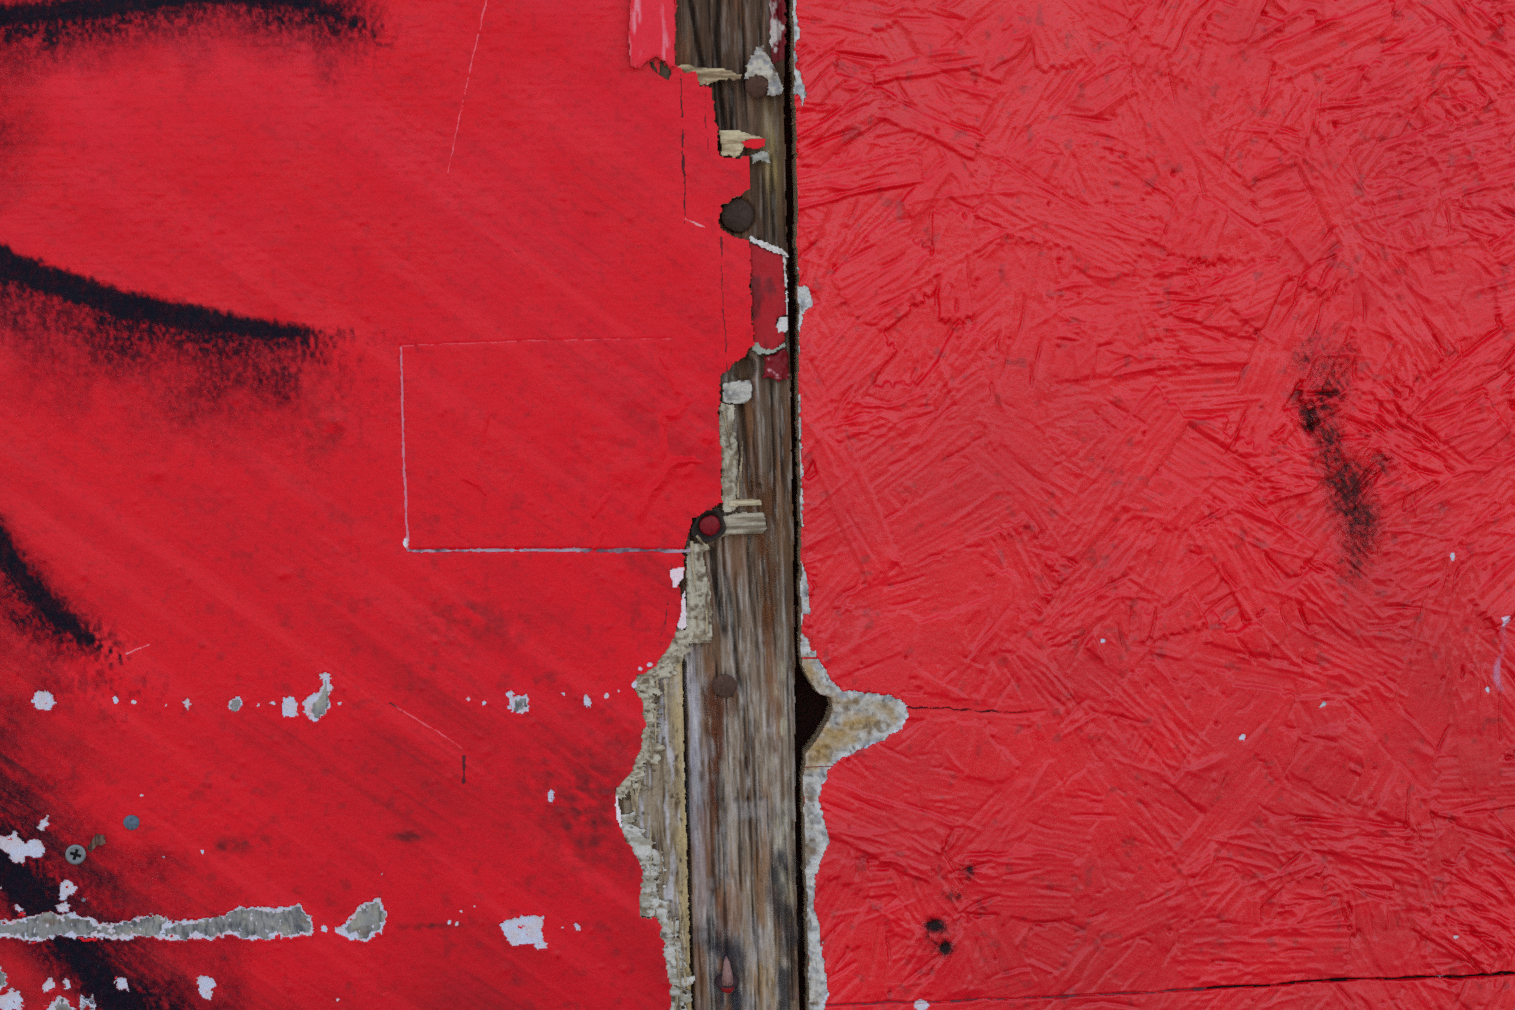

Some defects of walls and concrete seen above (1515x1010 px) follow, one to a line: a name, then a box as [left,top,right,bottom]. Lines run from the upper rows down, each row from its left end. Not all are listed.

spalling [790,0,807,106]
spalling [749,236,813,354]
peeling [670,567,687,629]
peeling [228,672,342,722]
spalling [798,561,909,1010]
peeling [0,815,49,866]
peeling [0,880,387,944]
peeling [499,915,548,950]
peeling [0,967,25,1010]
peeling [42,978,96,1010]
peeling [114,976,129,992]
peeling [197,975,216,1000]